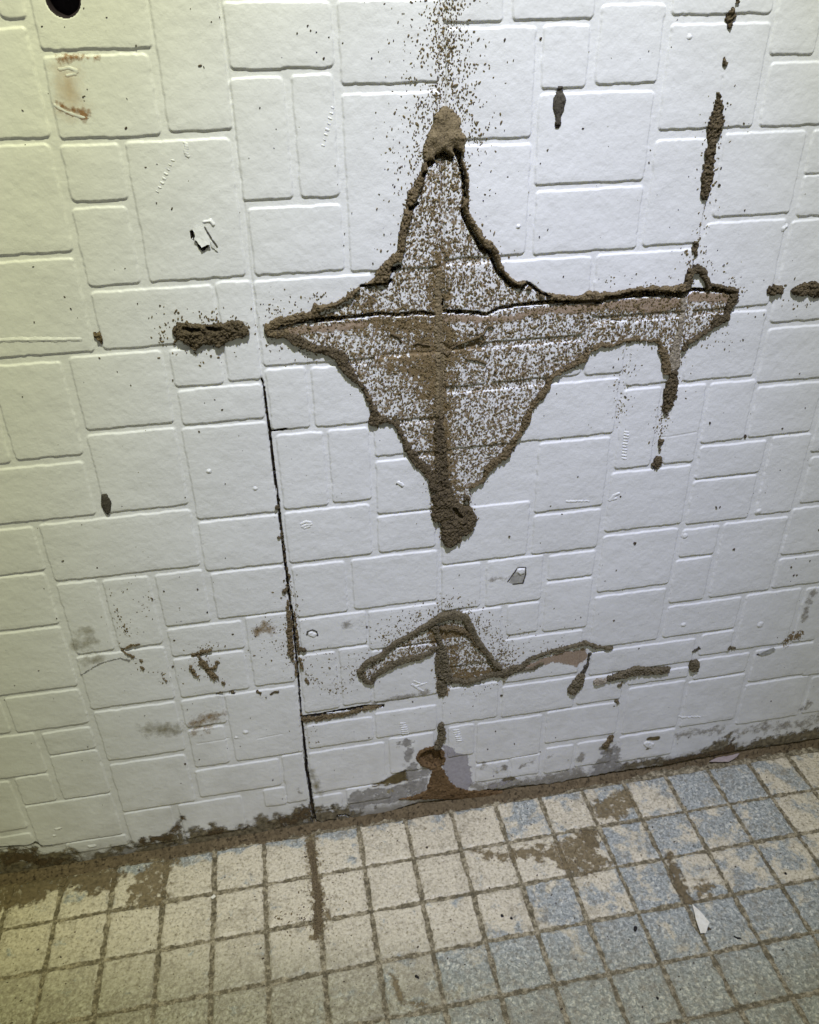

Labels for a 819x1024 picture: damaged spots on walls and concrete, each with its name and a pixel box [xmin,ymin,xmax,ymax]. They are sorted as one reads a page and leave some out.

corrosion [57,54,82,77]
corrosion [53,103,89,120]
peeling [190,218,218,252]
crack [278,288,728,329]
peeling [507,567,526,585]
crack [261,378,428,823]